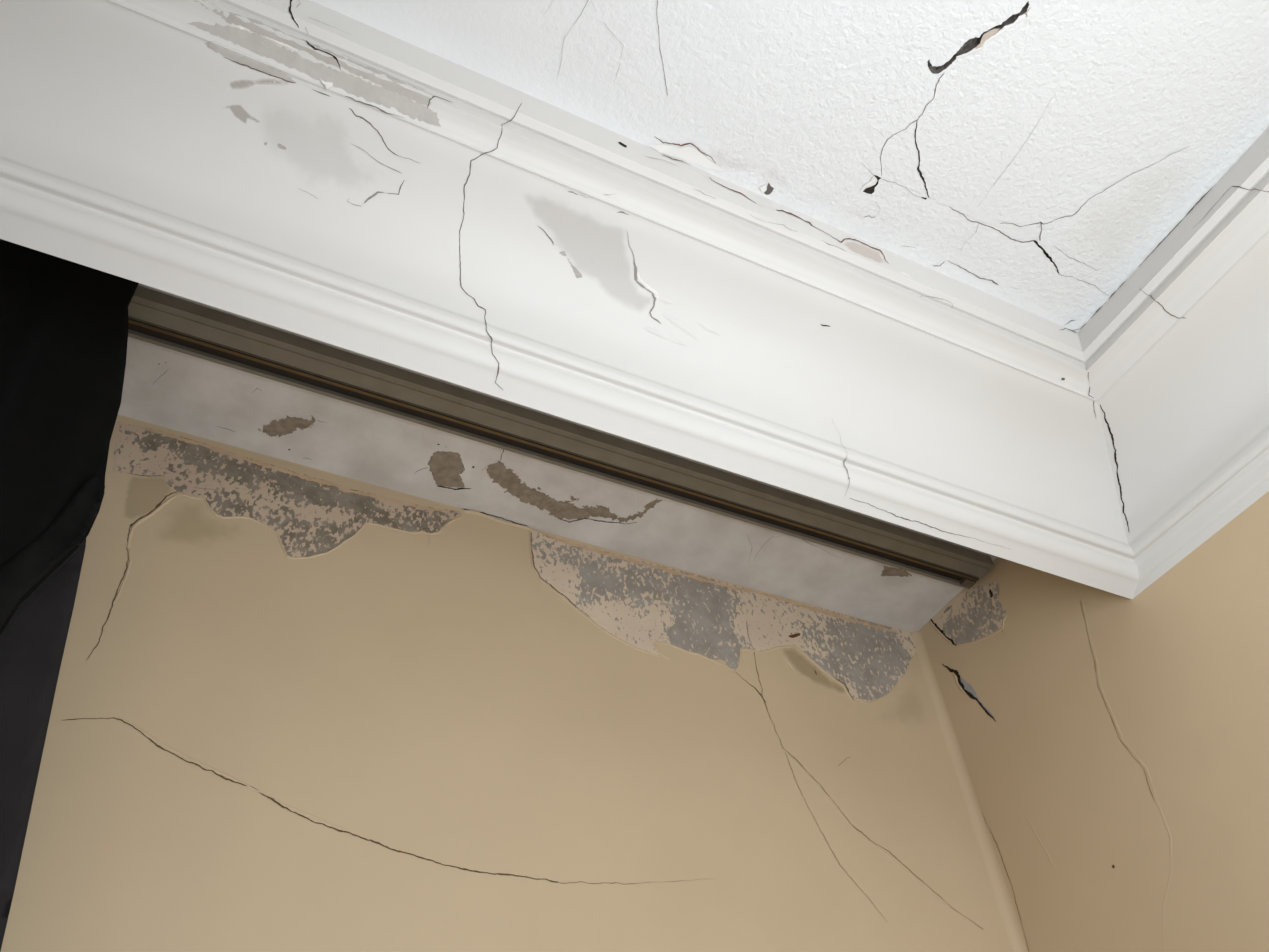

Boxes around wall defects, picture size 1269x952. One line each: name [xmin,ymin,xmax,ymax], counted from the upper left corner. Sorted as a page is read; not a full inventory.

crack [289,0,344,67]
peeling [187,0,453,127]
crack [349,108,418,163]
crack [459,102,522,390]
crack [646,136,953,307]
crack [880,1,1269,333]
flaking render [258,415,325,451]
crack [1088,372,1129,531]
peeling [88,421,916,705]
flaking render [928,581,1008,646]
peeling [942,664,995,721]
crack [67,714,698,884]